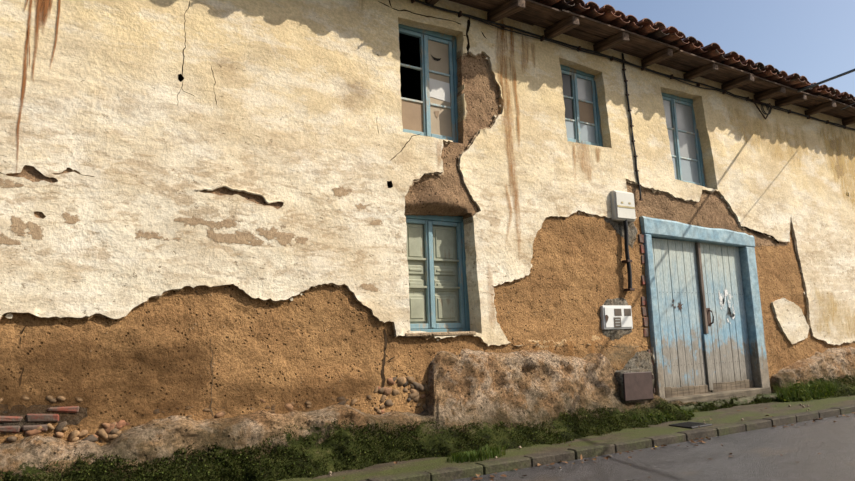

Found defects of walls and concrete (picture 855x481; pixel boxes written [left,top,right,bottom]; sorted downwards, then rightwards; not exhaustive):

rust [17,0,61,158]
flaking render [0,165,93,188]
crack [177,1,217,104]
spalling [404,51,502,225]
crack [381,328,394,387]
spalling [0,179,855,446]